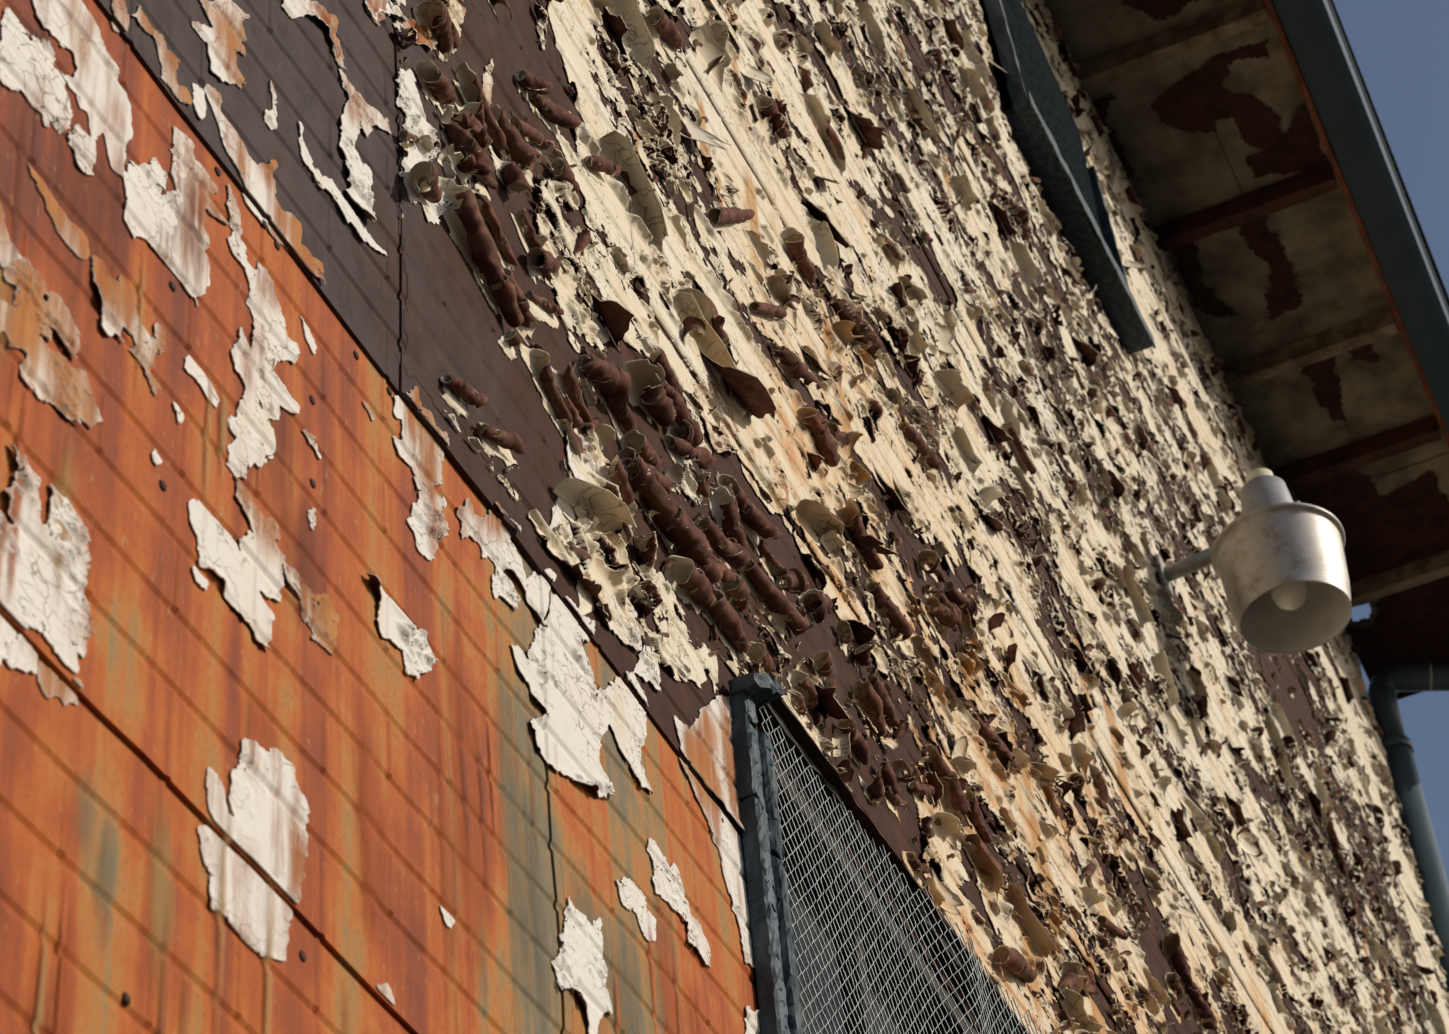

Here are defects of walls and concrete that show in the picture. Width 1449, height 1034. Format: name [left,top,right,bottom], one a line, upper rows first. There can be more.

peeling [280,0,391,256]
peeling [0,0,340,655]
corrosion [11,424,27,558]
peeling [0,443,95,706]
corrosion [57,465,73,566]
peeling [362,0,1449,1034]
corrosion [153,832,172,954]
corrosion [219,841,228,941]
peeling [196,738,310,962]
corrosion [249,712,274,752]
corrosion [439,659,496,949]
corrosion [649,925,682,1034]